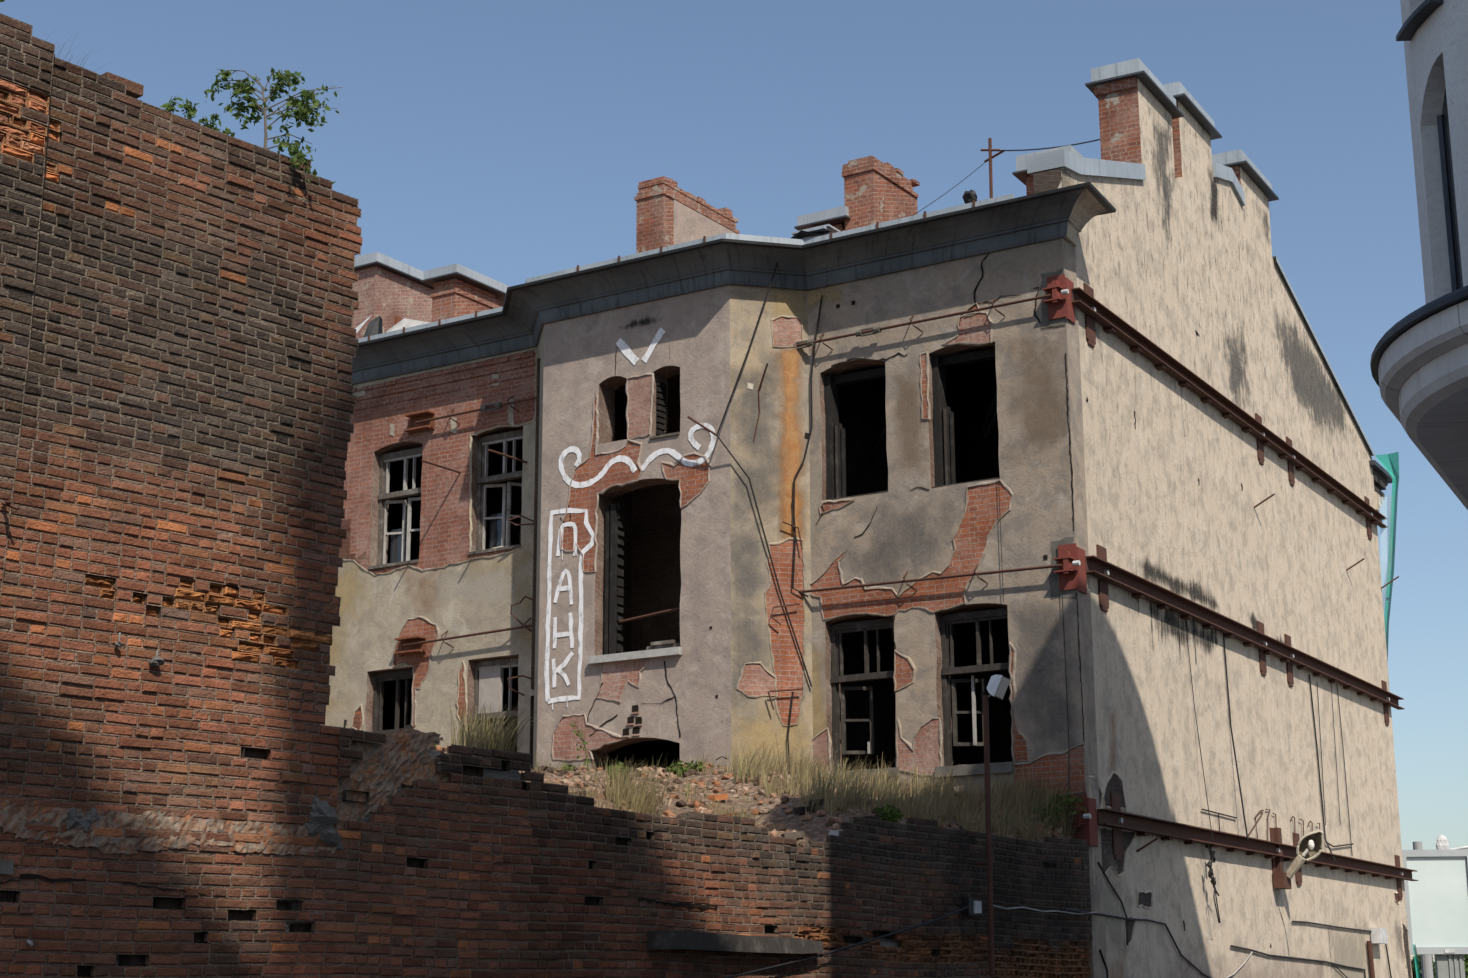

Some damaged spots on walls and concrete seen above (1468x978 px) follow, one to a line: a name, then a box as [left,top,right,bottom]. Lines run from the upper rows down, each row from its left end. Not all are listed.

spalling [0,79,60,184]
crack [0,54,55,607]
peeling [919,303,994,421]
damp [1277,322,1344,431]
spalling [83,563,332,670]
peeling [736,480,1014,727]
damp [1129,560,1217,663]
spalling [0,616,529,855]
peeling [551,659,649,762]
peeling [812,727,832,772]
crack [0,873,85,884]
crack [123,881,206,896]